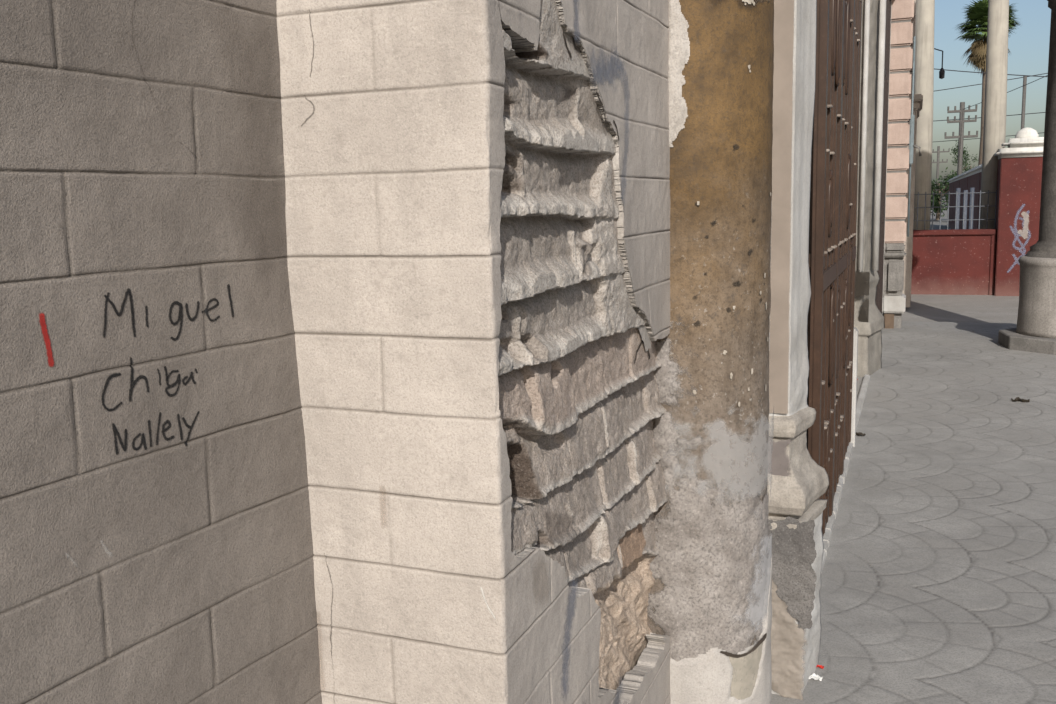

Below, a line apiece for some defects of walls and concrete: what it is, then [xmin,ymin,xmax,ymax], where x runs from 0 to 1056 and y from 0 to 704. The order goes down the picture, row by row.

spalling [498,0,670,704]
spalling [729,580,807,700]